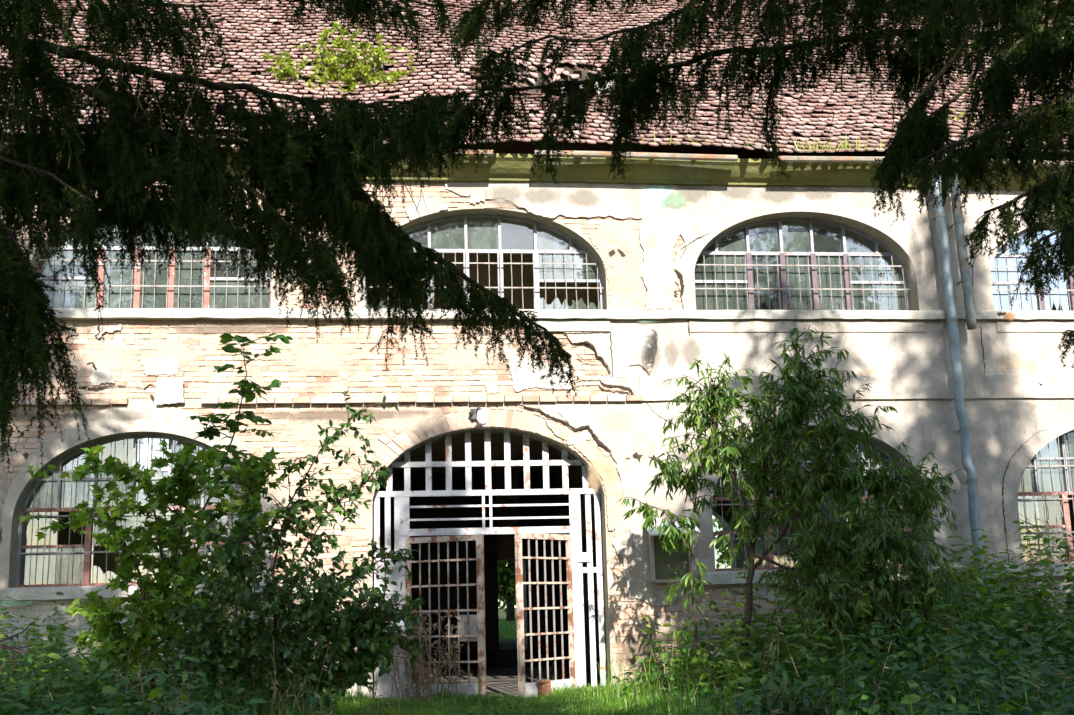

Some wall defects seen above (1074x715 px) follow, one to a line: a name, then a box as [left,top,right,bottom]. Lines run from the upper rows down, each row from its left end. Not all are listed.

flaking render [358,181,529,223]
peeling [555,214,686,310]
water stain [646,336,698,365]
flaking render [0,248,659,582]
flaking render [610,585,820,682]